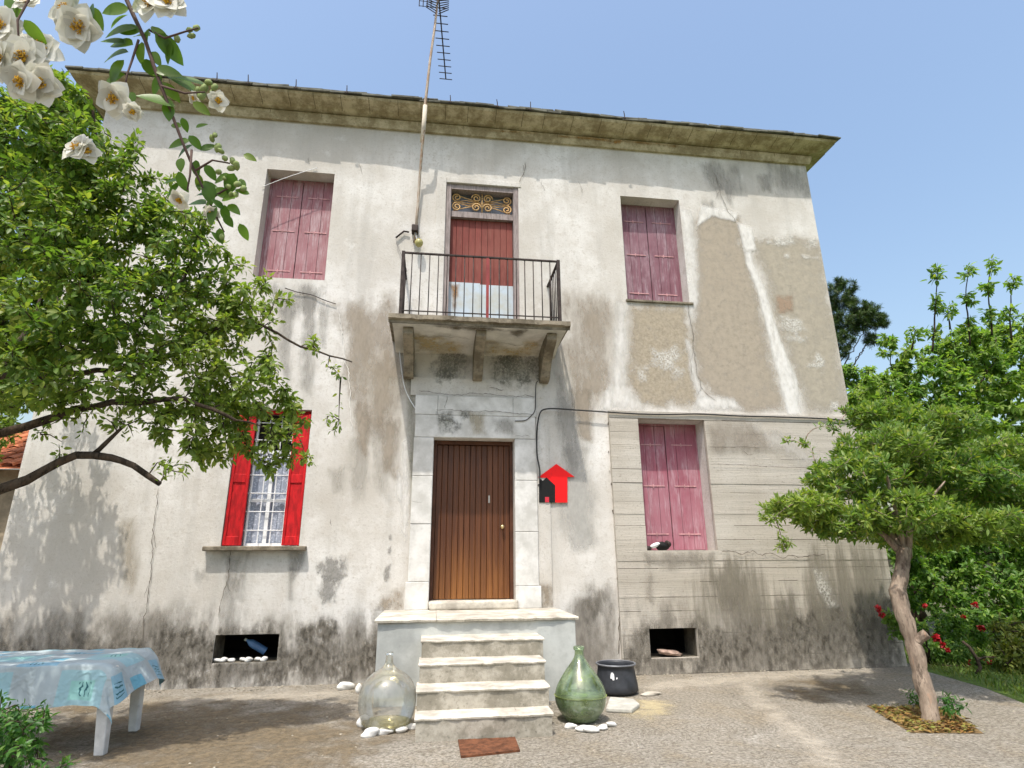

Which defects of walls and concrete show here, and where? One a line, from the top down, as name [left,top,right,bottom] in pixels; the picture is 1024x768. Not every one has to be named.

peeling [628,216,849,412]
leakage [680,166,800,415]
leakage [415,336,467,377]
leakage [492,343,539,385]
crack [142,493,158,640]
leakage [0,613,377,689]
leakage [317,559,346,601]
leakage [573,593,613,674]
leakage [628,560,901,675]